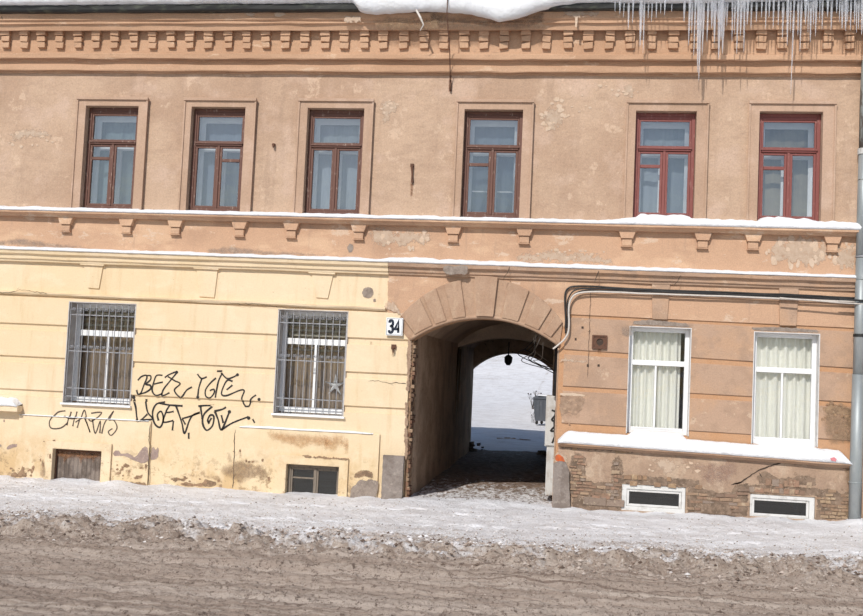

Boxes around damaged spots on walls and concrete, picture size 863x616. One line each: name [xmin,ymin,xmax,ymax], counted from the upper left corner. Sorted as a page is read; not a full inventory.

flaking render [368,227,430,252]
flaking render [765,235,856,272]
flaking render [113,447,159,485]
damp [224,462,263,479]
flaking render [554,446,849,521]
crack [731,463,780,485]